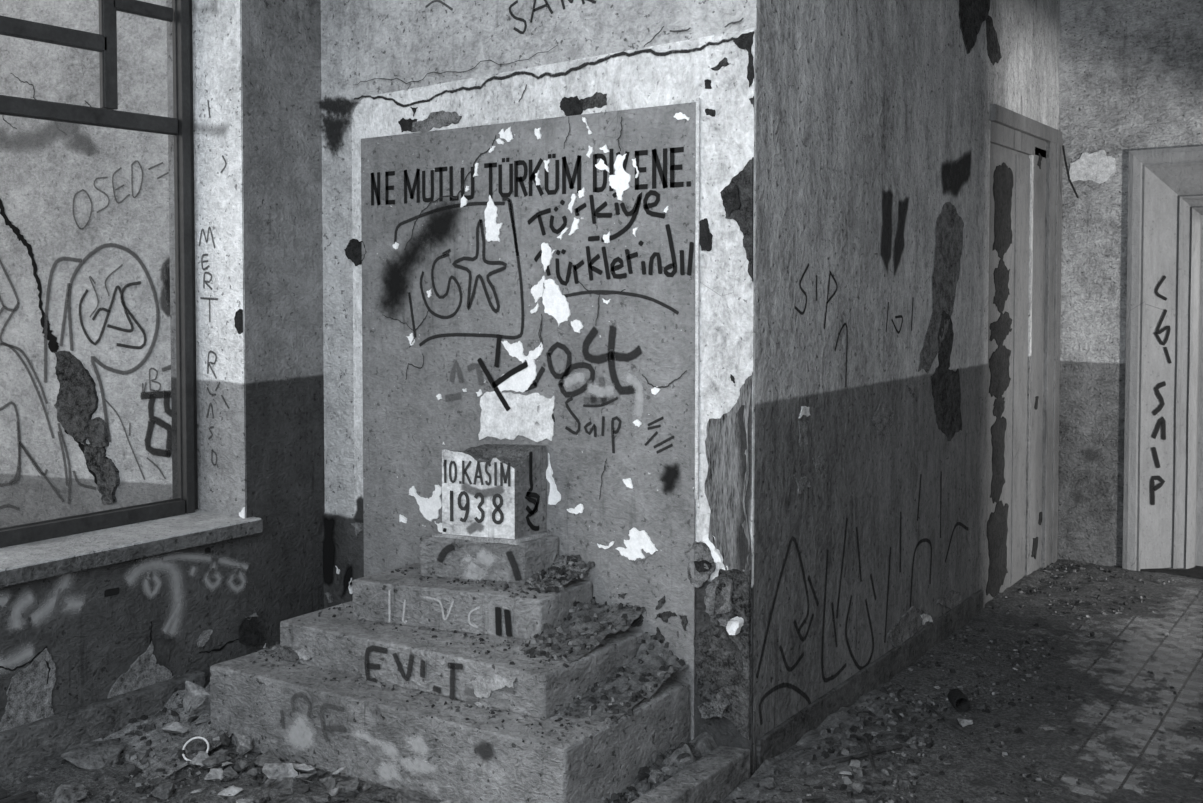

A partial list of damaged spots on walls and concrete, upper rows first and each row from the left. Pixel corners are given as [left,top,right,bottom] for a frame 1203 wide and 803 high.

crack [354,18,754,107]
flaking render [959,0,1002,65]
crack [0,199,59,353]
flaking render [53,350,120,504]
peeling [530,187,585,333]
flaking render [699,218,713,251]
flaking render [720,157,754,282]
flaking render [907,202,964,441]
peeling [986,162,1013,597]
peeling [409,485,442,533]
peeling [597,528,658,565]
flaking render [631,373,753,740]